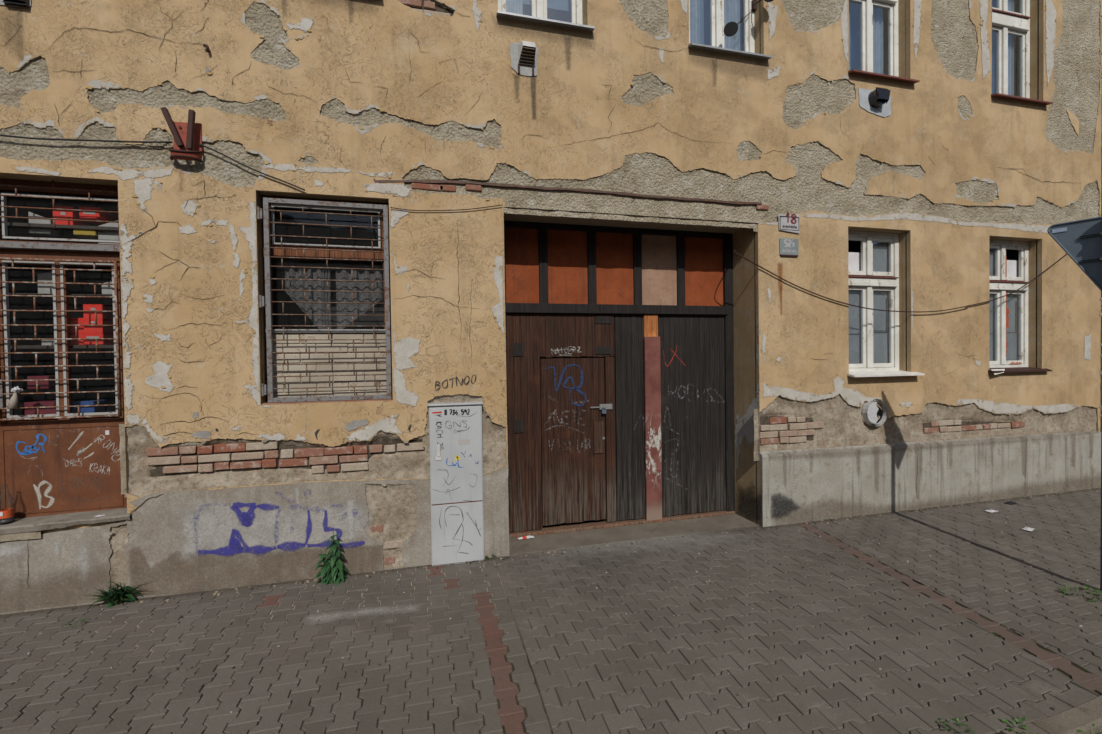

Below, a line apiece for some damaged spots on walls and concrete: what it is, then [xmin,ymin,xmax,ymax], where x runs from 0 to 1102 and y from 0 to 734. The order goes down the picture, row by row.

flaking render [241,0,313,70]
flaking render [398,0,457,16]
flaking render [619,0,688,63]
flaking render [767,0,856,129]
flaking render [913,0,991,82]
flaking render [1045,0,1101,154]
flaking render [0,54,1102,233]
flaking render [119,199,508,570]
flaking render [734,285,1098,469]